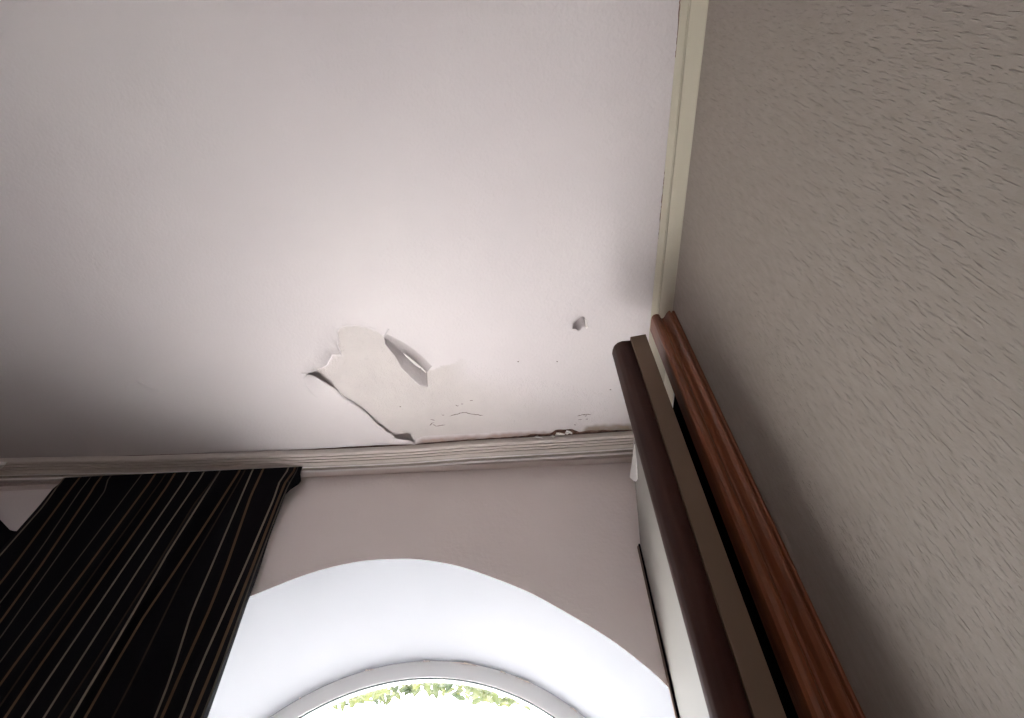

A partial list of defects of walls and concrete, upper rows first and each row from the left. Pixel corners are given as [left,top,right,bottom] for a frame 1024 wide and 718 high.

peeling [301,317,630,445]